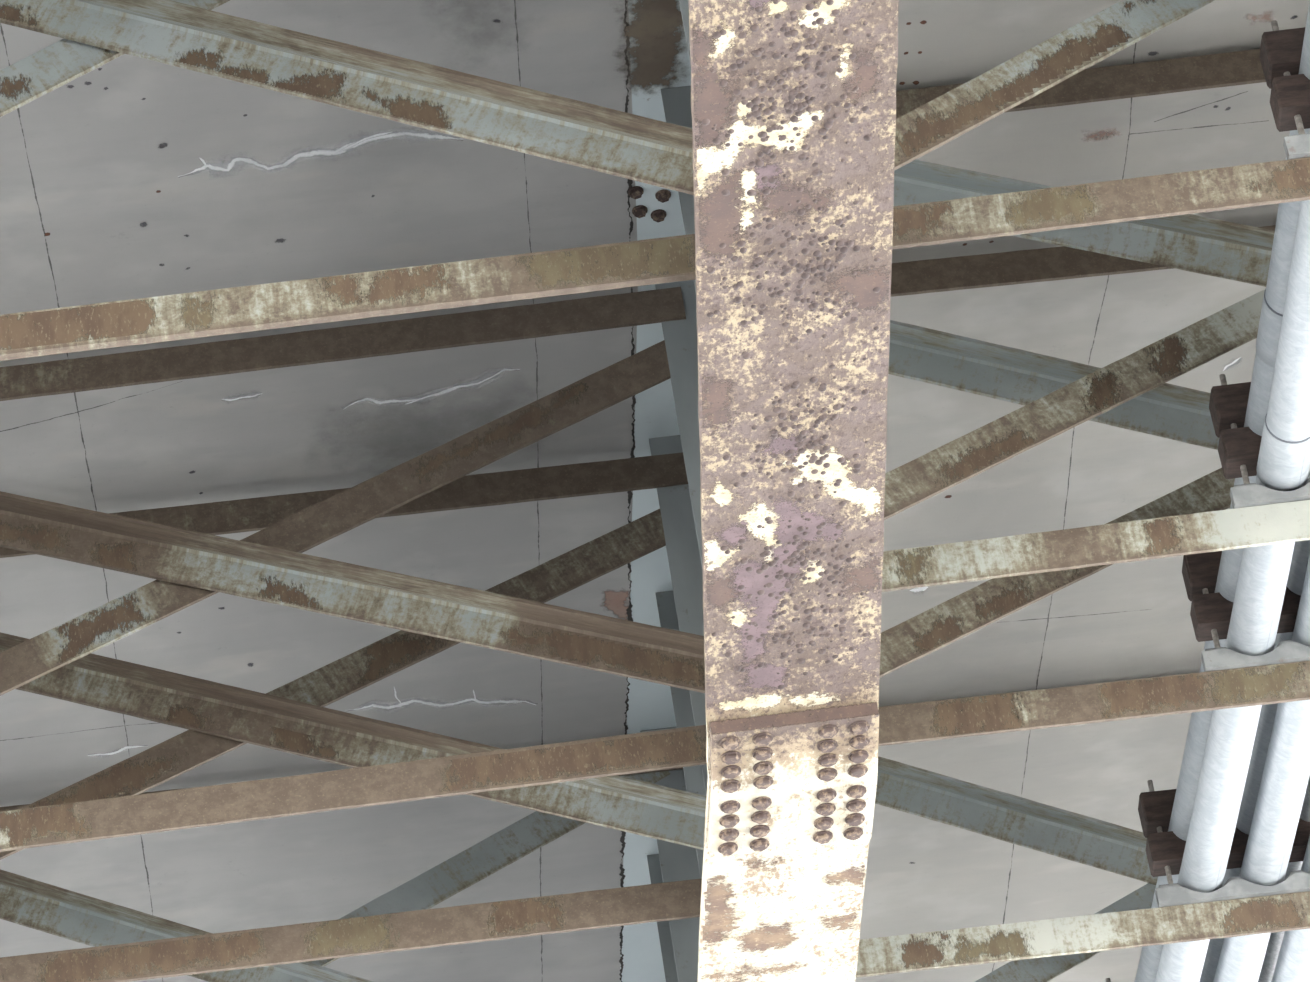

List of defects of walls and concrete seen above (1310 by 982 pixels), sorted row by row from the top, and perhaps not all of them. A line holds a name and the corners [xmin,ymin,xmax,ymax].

water stain [618,0,685,94]
corrosion [176,48,346,100]
corrosion [362,86,452,129]
crack [178,132,464,177]
corrosion [518,169,837,289]
corrosion [0,299,161,350]
crack [343,369,520,410]
crack [350,687,536,710]
corrosion [825,865,865,887]
corrosion [701,875,808,982]
corrosion [819,909,859,931]
corrosion [38,931,265,982]